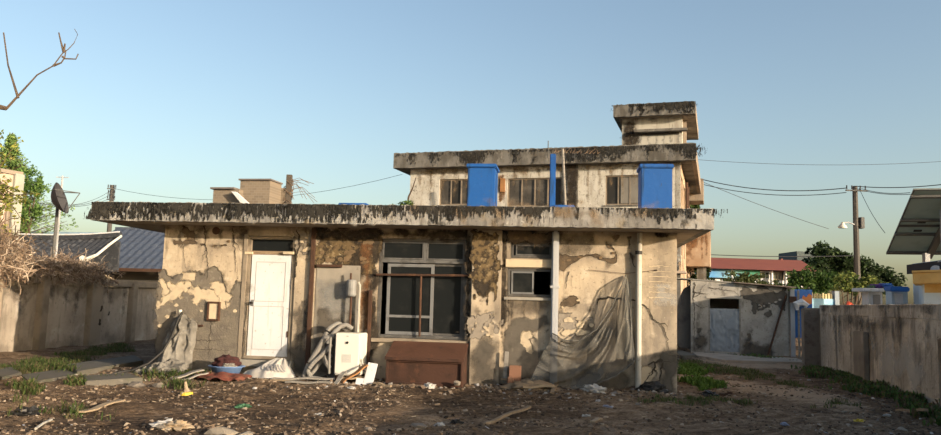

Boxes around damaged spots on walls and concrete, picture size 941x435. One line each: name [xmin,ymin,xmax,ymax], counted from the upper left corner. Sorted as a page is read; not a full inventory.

water stain [611,101,697,115]
crack [183,225,209,276]
peeling [173,225,231,247]
peeling [291,227,384,275]
water stain [84,132,728,382]
peeling [559,235,635,271]
flaking render [154,266,247,371]
peeling [467,311,504,340]
peeling [558,295,594,337]
crack [597,296,674,382]
flaking render [739,286,788,320]